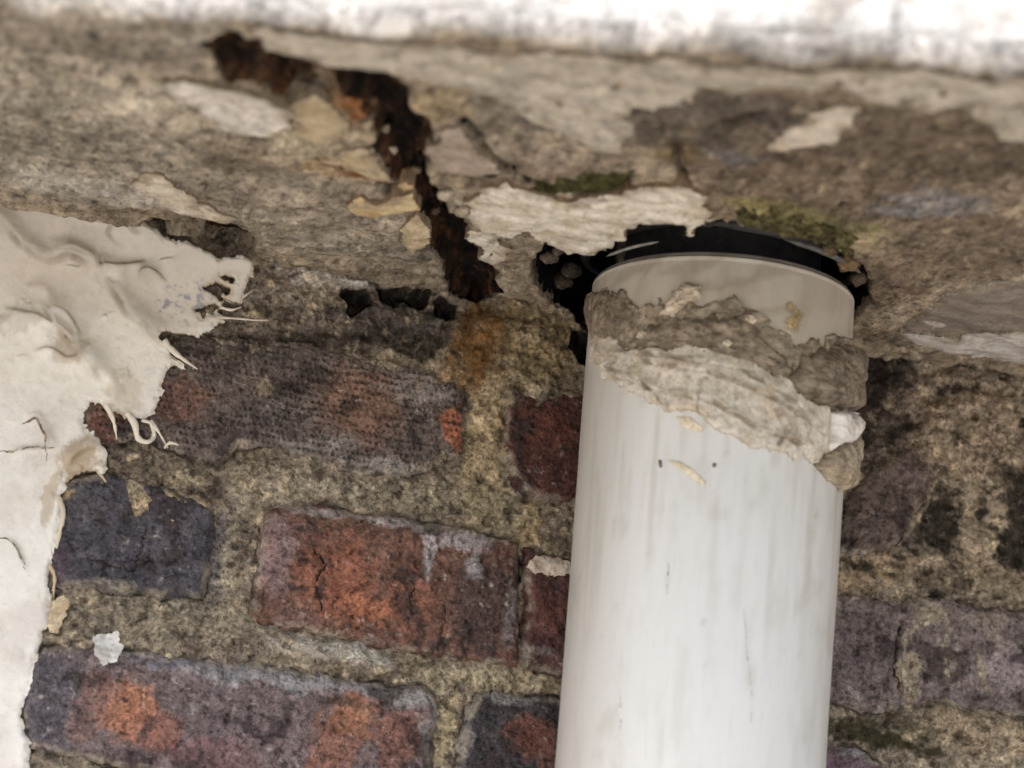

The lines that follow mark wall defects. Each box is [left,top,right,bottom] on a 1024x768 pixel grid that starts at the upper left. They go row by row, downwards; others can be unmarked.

peeling [161,74,295,137]
crack [202,30,504,302]
peeling [339,113,432,252]
crack [484,165,532,182]
peeling [463,171,714,265]
peeling [246,23,1024,154]
peeling [0,171,268,768]